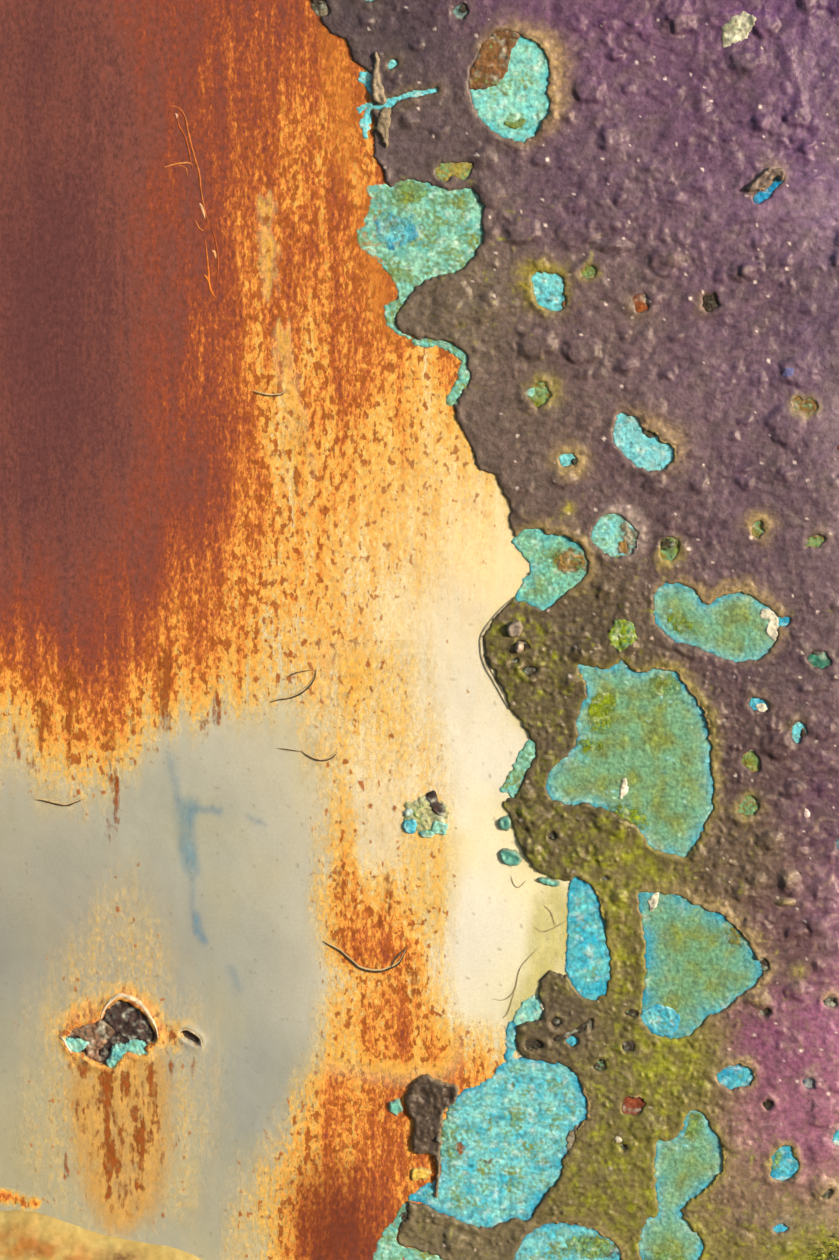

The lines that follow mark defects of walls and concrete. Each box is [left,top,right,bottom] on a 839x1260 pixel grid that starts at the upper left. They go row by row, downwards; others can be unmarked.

peeling [468,31,520,90]
peeling [356,179,484,406]
corrosion [0,0,507,1260]
peeling [511,529,588,610]
peeling [653,583,779,663]
spalling [402,790,449,838]
peeling [546,660,714,857]
hole [60,993,159,1068]
peeling [537,876,611,1000]
peeling [624,892,769,1039]
peeling [373,995,621,1260]
peeling [638,1110,726,1260]